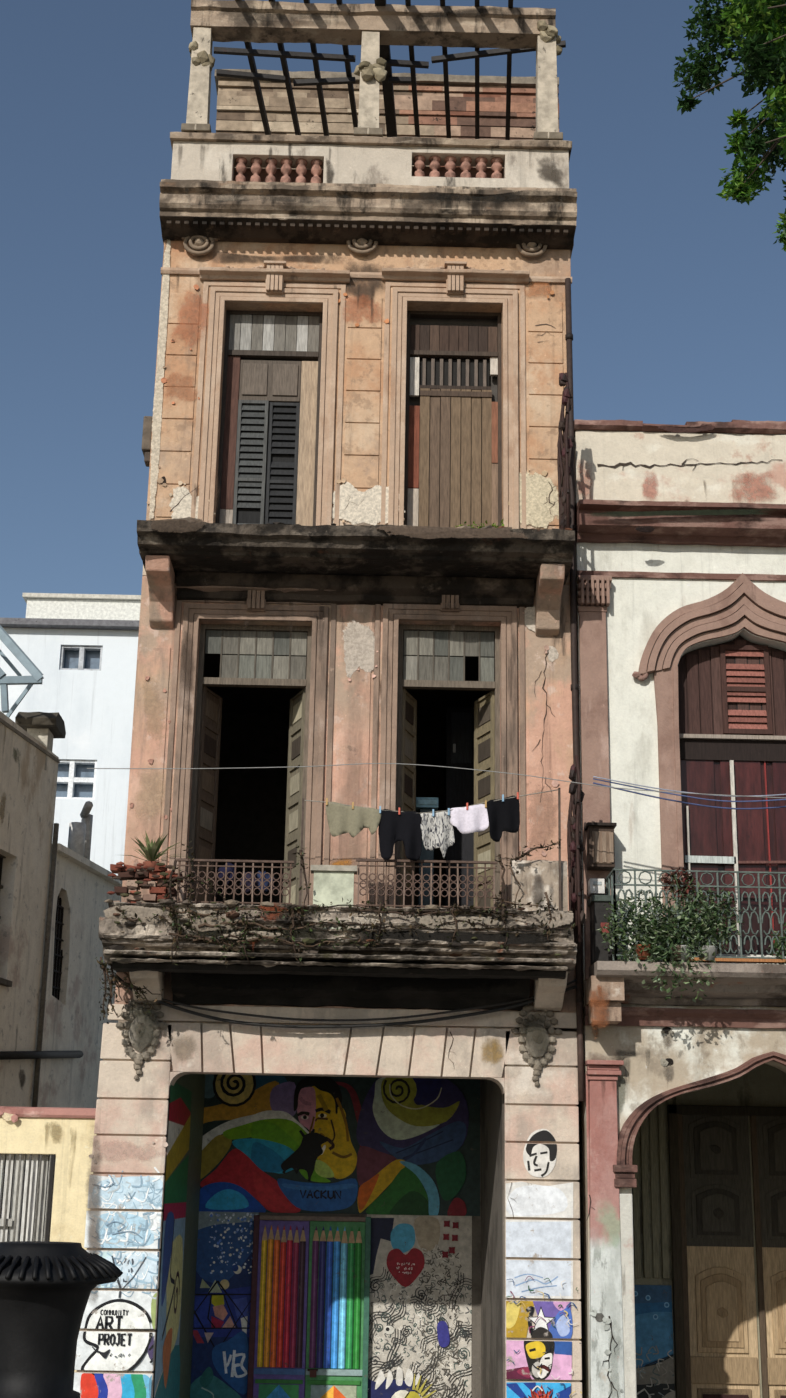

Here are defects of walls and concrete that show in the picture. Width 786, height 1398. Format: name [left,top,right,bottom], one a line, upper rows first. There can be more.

flaking render [147,240,215,533]
crack [597,458,780,470]
flaking render [332,469,559,539]
flaking render [342,619,378,681]
crack [532,651,555,802]
spalling [103,905,169,924]
spalling [191,915,283,940]
spalling [338,916,376,929]
crack [602,1316,618,1398]